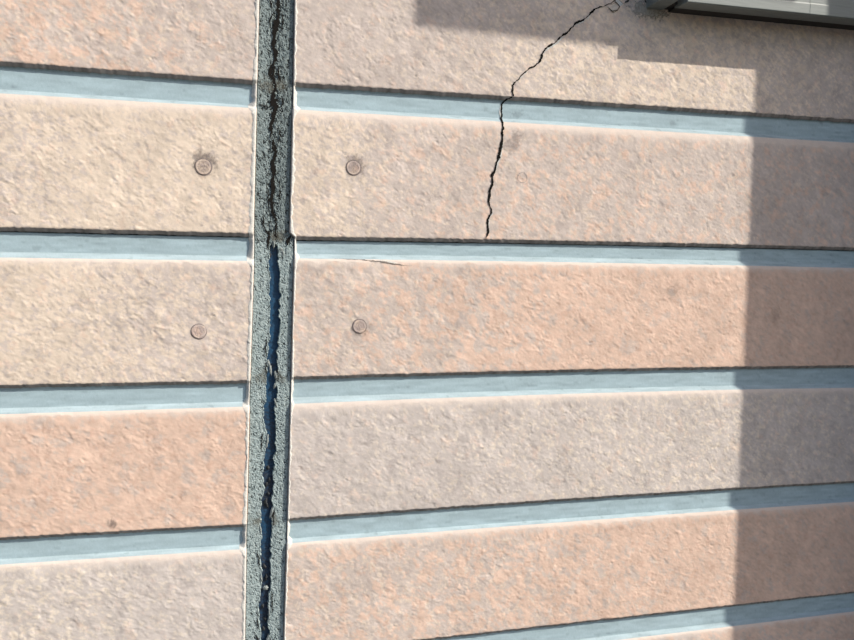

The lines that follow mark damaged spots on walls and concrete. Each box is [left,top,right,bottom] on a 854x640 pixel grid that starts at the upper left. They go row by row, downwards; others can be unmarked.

crack [245,0,294,640]
crack [486,0,646,237]